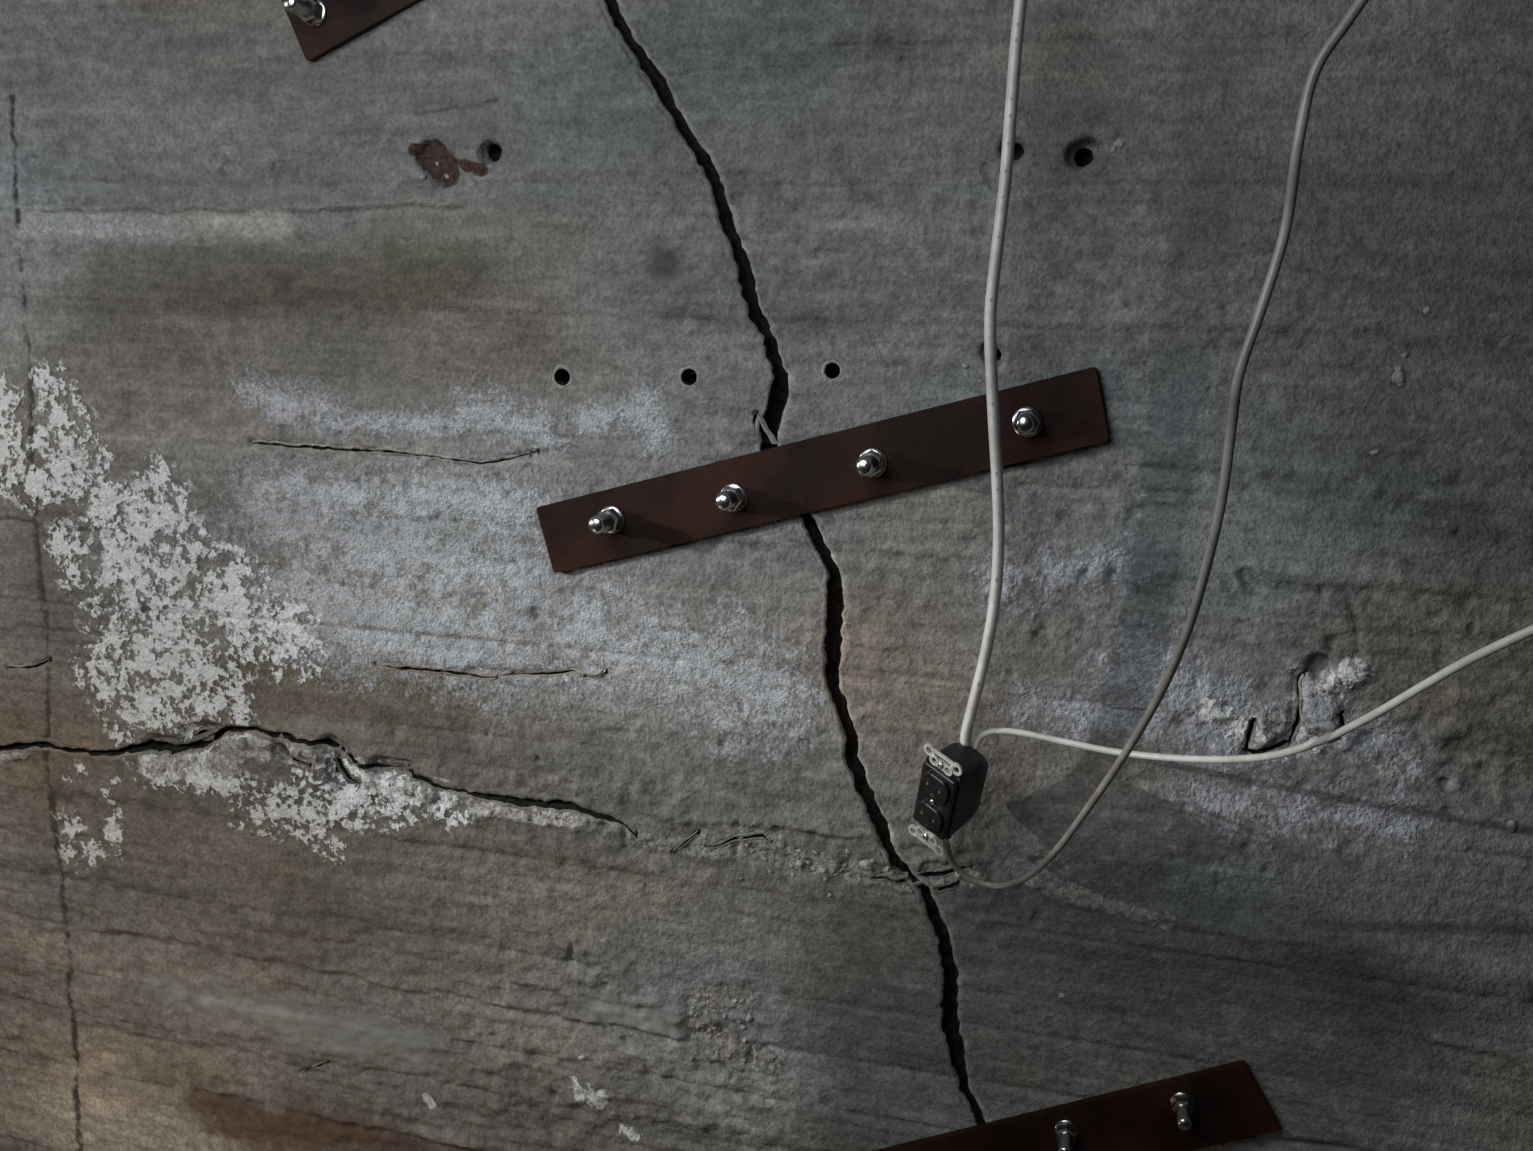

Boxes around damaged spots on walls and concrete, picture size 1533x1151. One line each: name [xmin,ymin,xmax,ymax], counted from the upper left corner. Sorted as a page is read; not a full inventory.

water stain [19,216,180,245]
crack [598,0,796,452]
crack [250,440,539,467]
water stain [0,358,828,874]
crack [376,662,608,681]
spalling [1314,658,1369,699]
spalling [1253,708,1277,746]
spalling [1299,718,1324,751]
spalling [0,751,30,764]
crack [0,722,638,839]
spalling [137,723,589,828]
crack [796,511,991,1126]